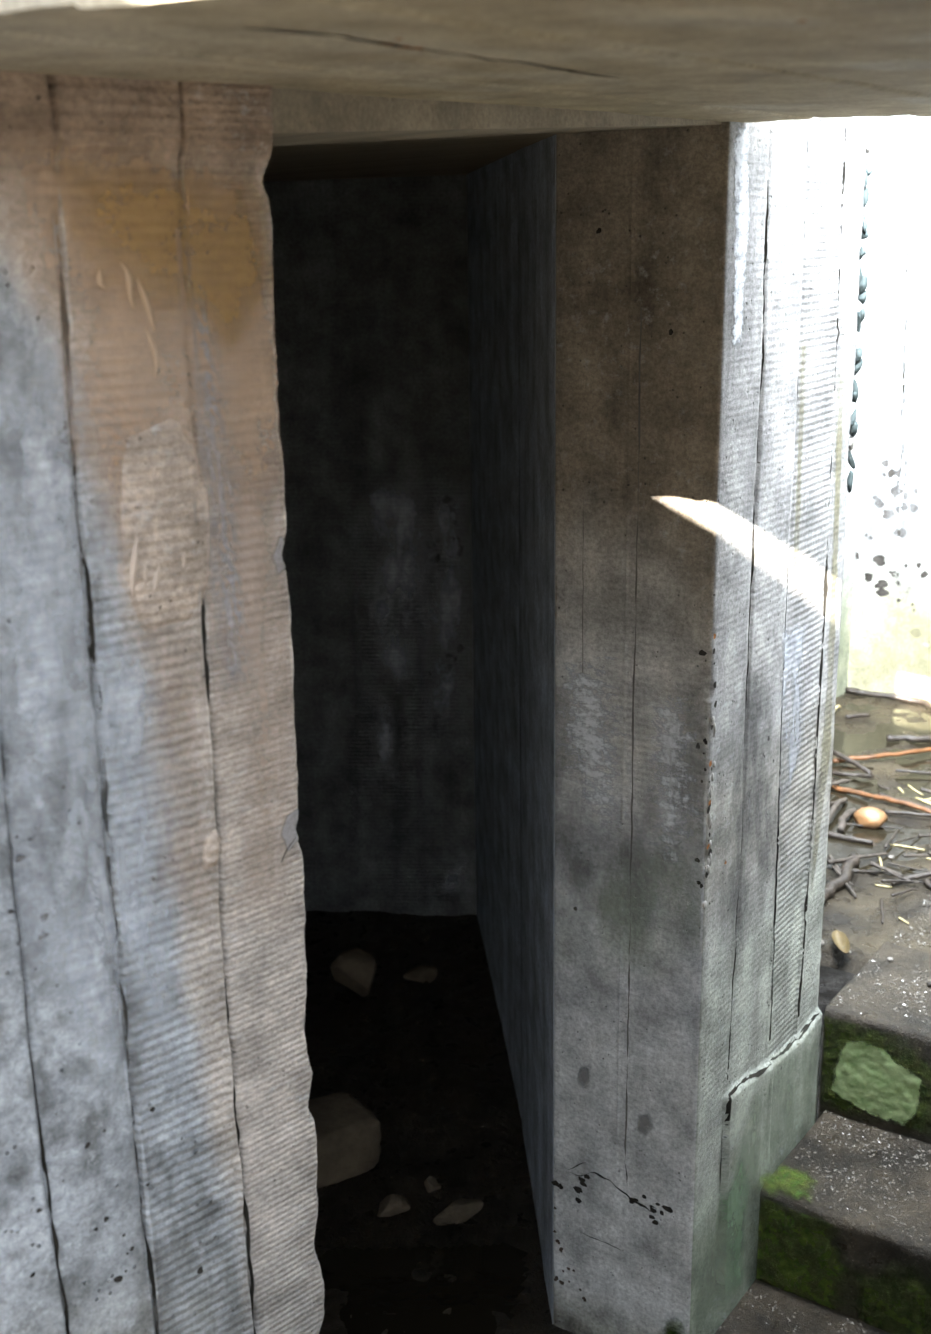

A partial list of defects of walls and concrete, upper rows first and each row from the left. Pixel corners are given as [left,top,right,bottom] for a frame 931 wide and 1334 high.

crack [745,186,769,708]
crack [834,126,846,391]
crack [720,541,828,1183]
peeling [832,1042,922,1124]